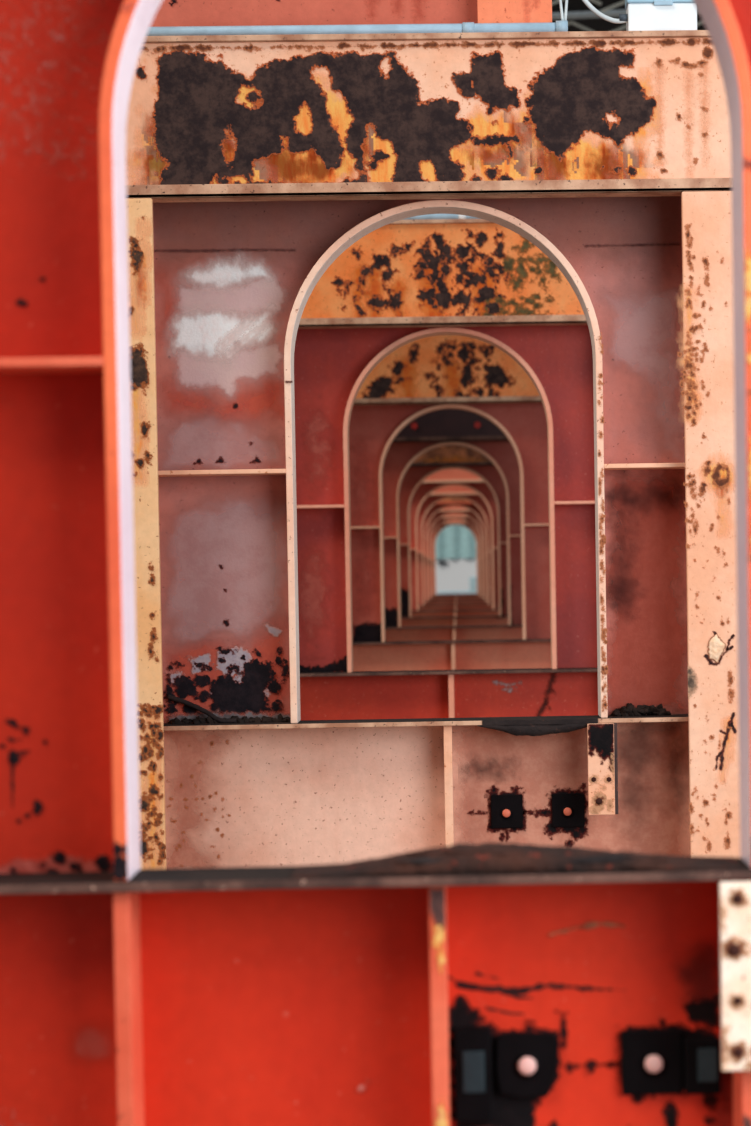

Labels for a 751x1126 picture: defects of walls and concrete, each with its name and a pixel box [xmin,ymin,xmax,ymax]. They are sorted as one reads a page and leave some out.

corrosion [128,38,714,185]
corrosion [331,225,517,318]
corrosion [128,216,153,483]
corrosion [361,336,517,398]
corrosion [677,224,724,439]
corrosion [684,459,735,568]
corrosion [148,612,159,662]
peeling [163,622,291,721]
corrosion [687,667,709,721]
corrosion [0,718,44,824]
corrosion [113,703,231,881]
corrosion [688,781,732,851]